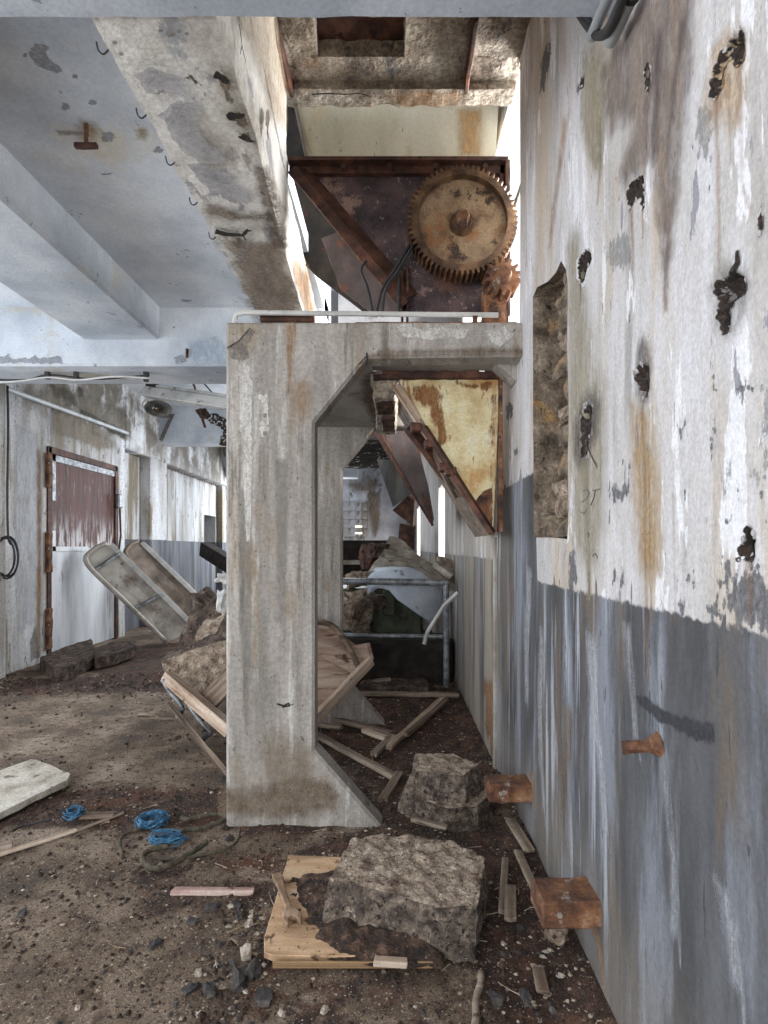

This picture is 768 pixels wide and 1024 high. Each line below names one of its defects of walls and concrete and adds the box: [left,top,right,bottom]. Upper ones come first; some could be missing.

spalling [695,30,746,162]
leakage [581,0,691,305]
spalling [626,175,646,214]
leakage [206,167,300,323]
spalling [577,249,592,291]
spalling [711,250,748,335]
corrosion [413,385,446,446]
corrosion [456,380,496,404]
spalling [632,340,650,402]
corrosion [476,479,496,525]
corrosion [634,413,657,573]
peeling [706,526,768,638]